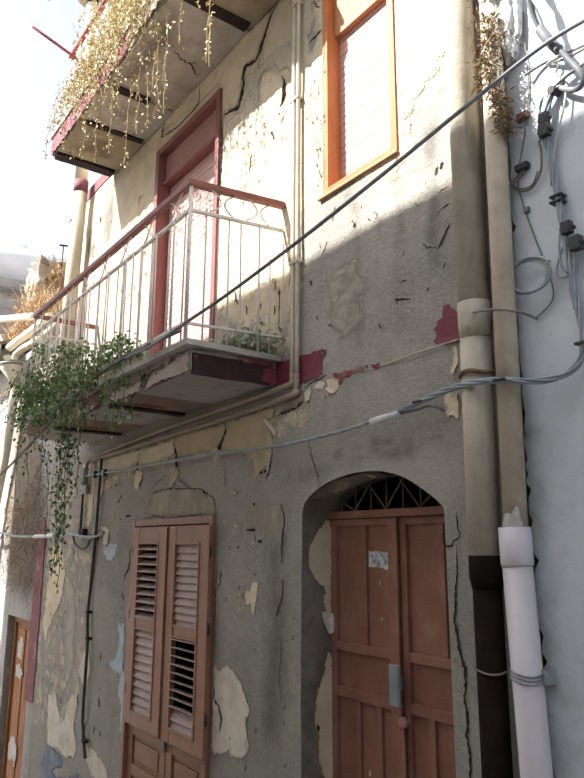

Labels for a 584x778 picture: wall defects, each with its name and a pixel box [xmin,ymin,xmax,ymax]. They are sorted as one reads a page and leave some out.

crack [161,51,200,138]
crack [219,3,278,196]
peeling [428,304,460,374]
peeling [83,349,380,561]
peeling [443,392,460,418]
peeling [39,542,90,684]
peeling [40,693,107,778]
peeling [100,622,125,732]
peeling [211,665,257,770]
peeling [308,520,334,634]
peeling [314,652,333,778]
crack [443,513,472,778]